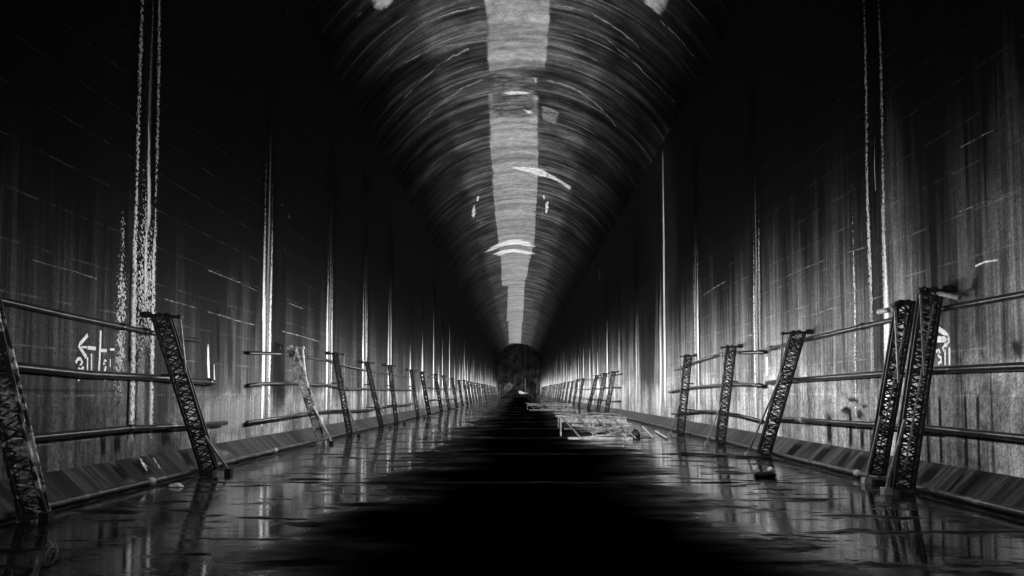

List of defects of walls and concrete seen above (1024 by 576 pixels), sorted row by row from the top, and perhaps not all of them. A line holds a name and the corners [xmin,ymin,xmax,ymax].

water stain [114,0,161,440]
water stain [841,0,891,439]